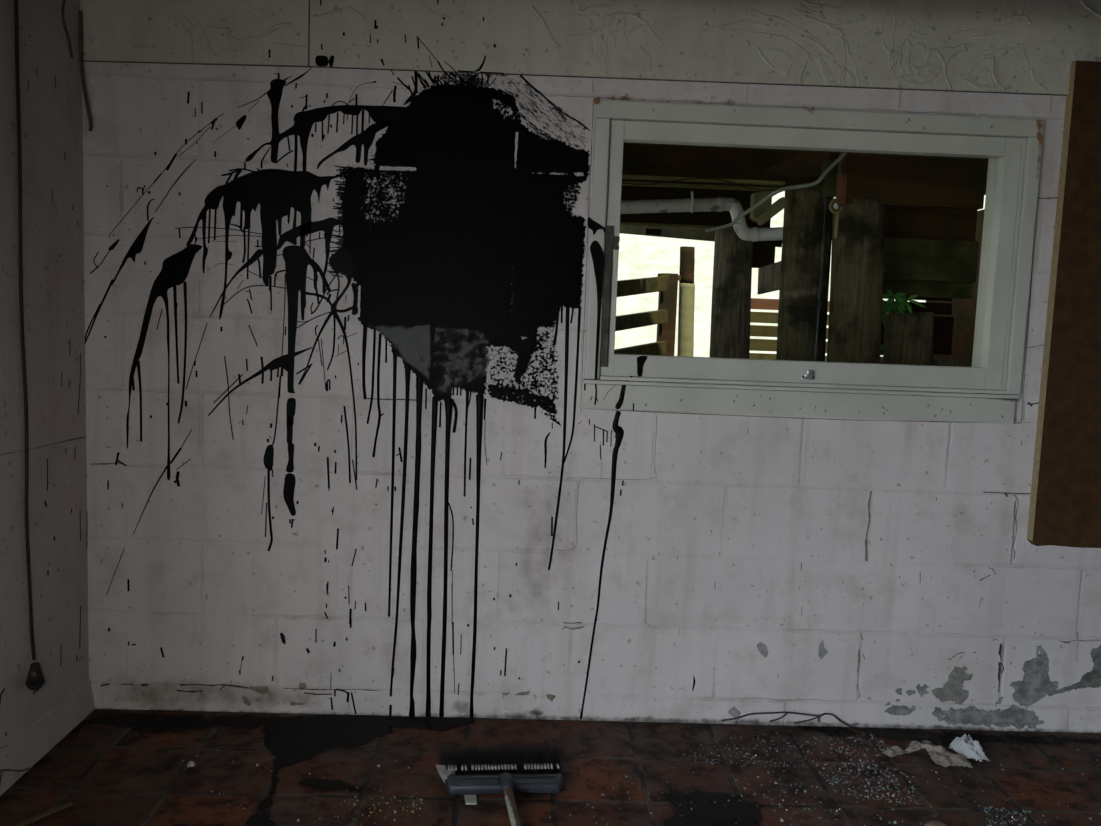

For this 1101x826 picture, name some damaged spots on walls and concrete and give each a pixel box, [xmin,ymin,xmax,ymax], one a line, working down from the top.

peeling [757,642,768,658]
crack [948,639,1004,692]
peeling [885,644,1101,730]